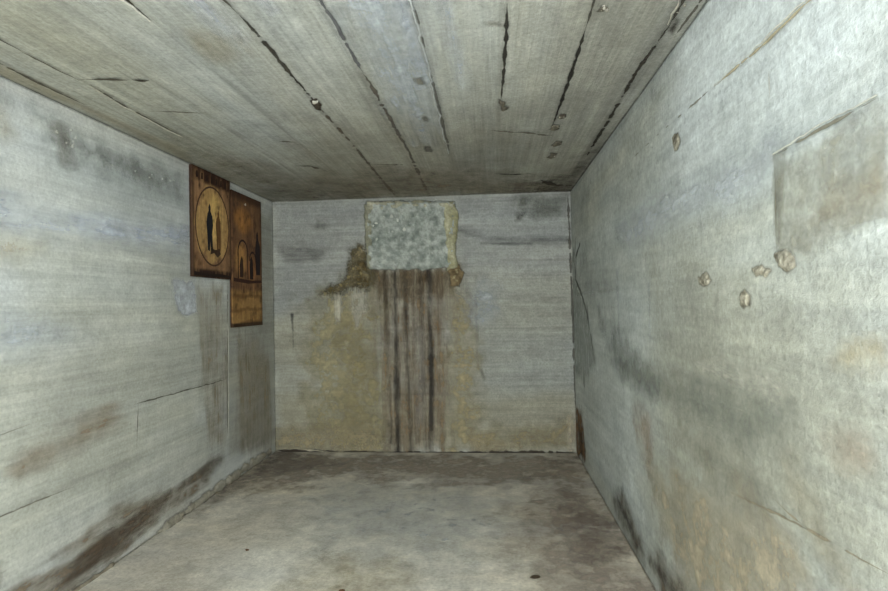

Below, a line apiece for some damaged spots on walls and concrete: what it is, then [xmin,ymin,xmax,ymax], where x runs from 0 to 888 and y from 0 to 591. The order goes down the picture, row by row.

crack [121,0,150,22]
crack [223,0,427,194]
crack [408,0,449,154]
crack [491,0,595,136]
crack [587,0,702,155]
crack [635,0,810,156]
crack [772,93,878,222]
spalling [323,244,377,295]
spalling [448,265,464,287]
damp [238,285,683,591]
damp [12,458,222,591]